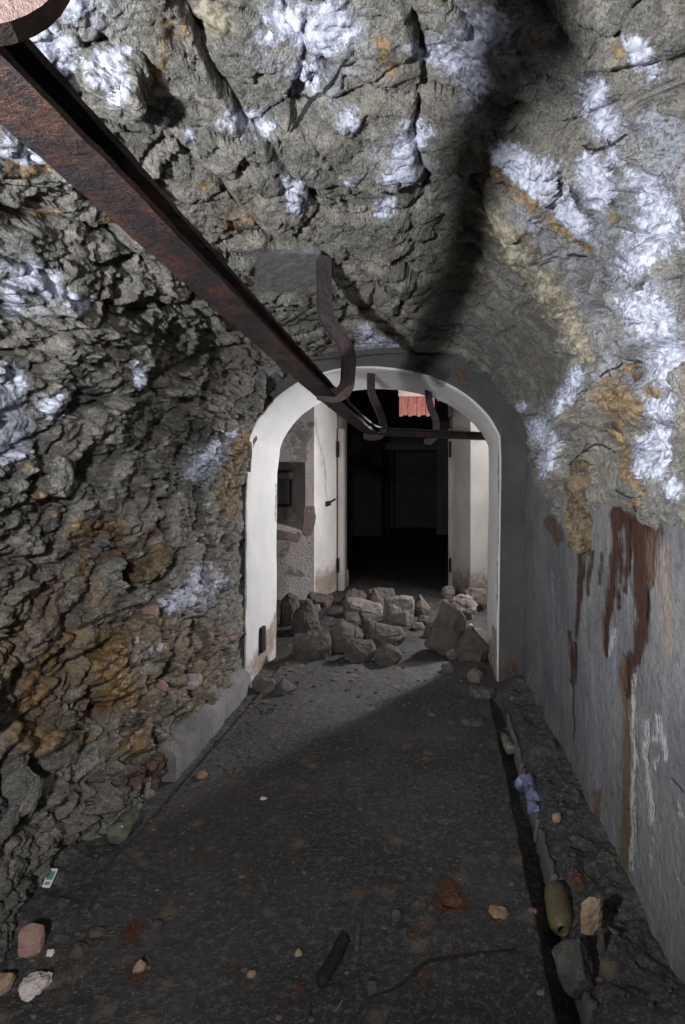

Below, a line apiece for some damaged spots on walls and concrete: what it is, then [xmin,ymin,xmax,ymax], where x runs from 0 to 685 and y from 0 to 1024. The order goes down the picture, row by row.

leakage [30,0,136,107]
leakage [150,0,233,90]
leakage [255,0,361,94]
leakage [612,35,663,85]
leakage [218,107,276,139]
leakage [281,175,307,217]
leakage [334,108,364,134]
leakage [374,111,435,218]
leakage [475,75,685,508]
leakage [0,359,64,468]
leakage [157,562,229,614]
corrosion [567,506,662,711]